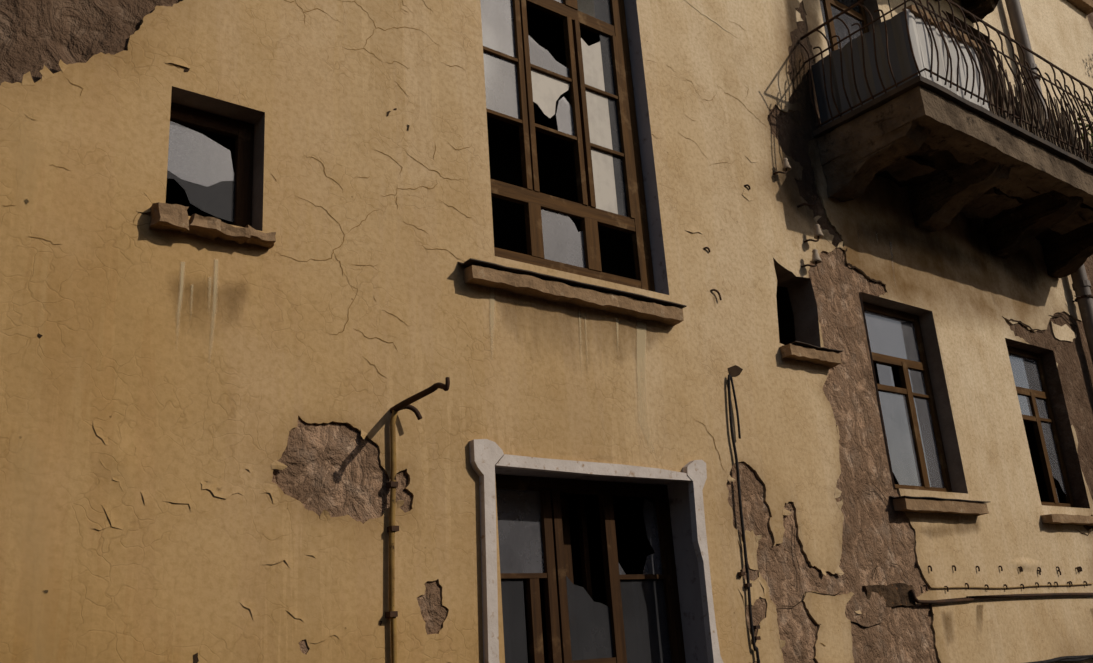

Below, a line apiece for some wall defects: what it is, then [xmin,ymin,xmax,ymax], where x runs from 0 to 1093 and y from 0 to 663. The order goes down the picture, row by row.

flaking render [0,0,183,85]
crack [285,0,462,97]
crack [277,145,472,379]
flaking render [1084,255,1093,295]
flaking render [726,0,939,663]
flaking render [1004,312,1093,500]
peeling [271,417,412,523]
peeling [417,580,448,635]